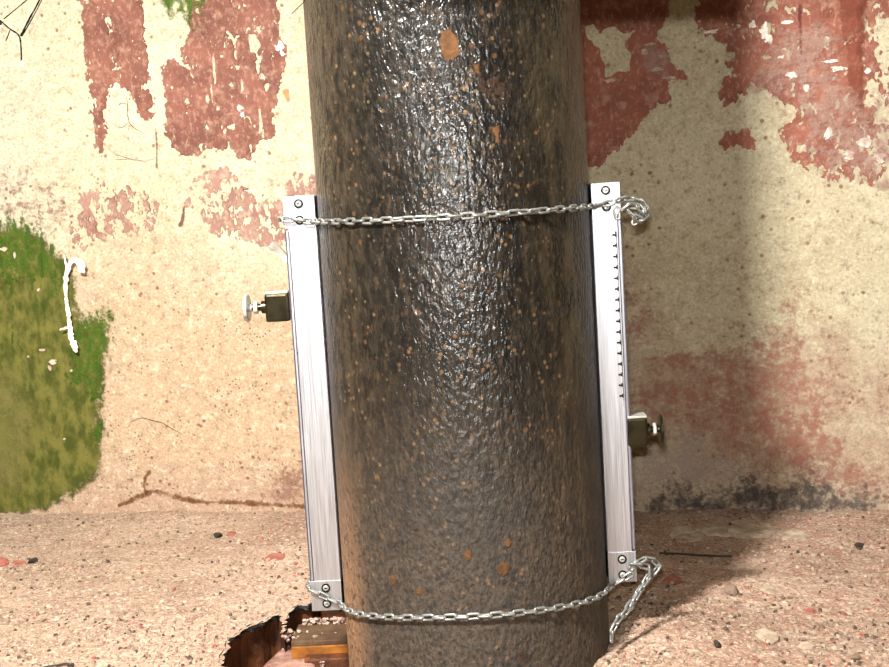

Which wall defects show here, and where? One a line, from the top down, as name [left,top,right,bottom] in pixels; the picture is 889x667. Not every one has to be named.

peeling [76,0,287,161]
rust [439,29,460,61]
peeling [580,0,688,169]
peeling [694,0,889,188]
peeling [183,166,316,251]
damp [640,328,886,512]